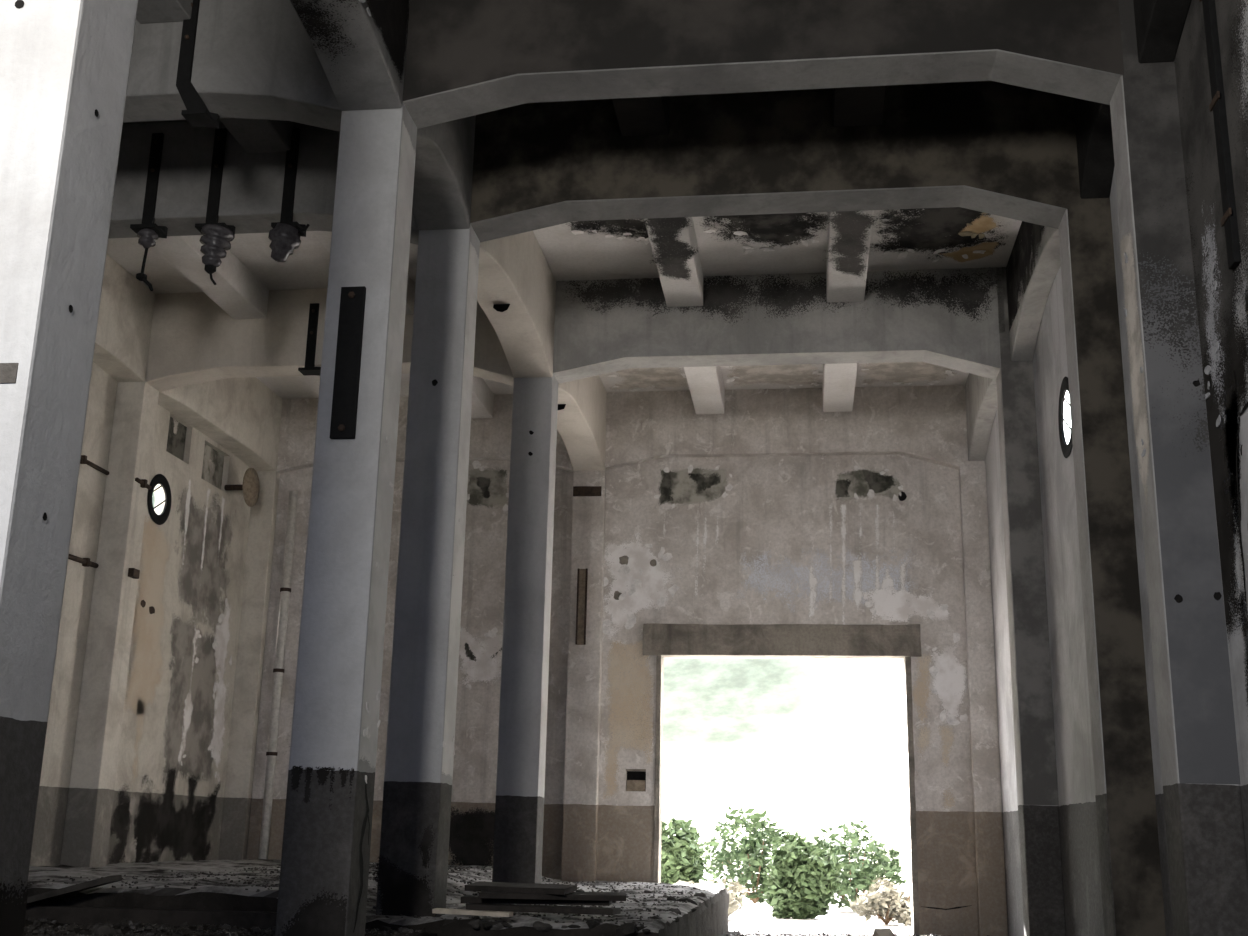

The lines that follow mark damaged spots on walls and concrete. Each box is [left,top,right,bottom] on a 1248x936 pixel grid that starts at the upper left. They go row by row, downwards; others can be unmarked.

leakage [107,479,237,865]
peeling [442,242,509,781]
peeling [571,230,650,245]
peeling [603,464,733,641]
spalling [828,466,968,725]
leakage [1174,0,1248,716]